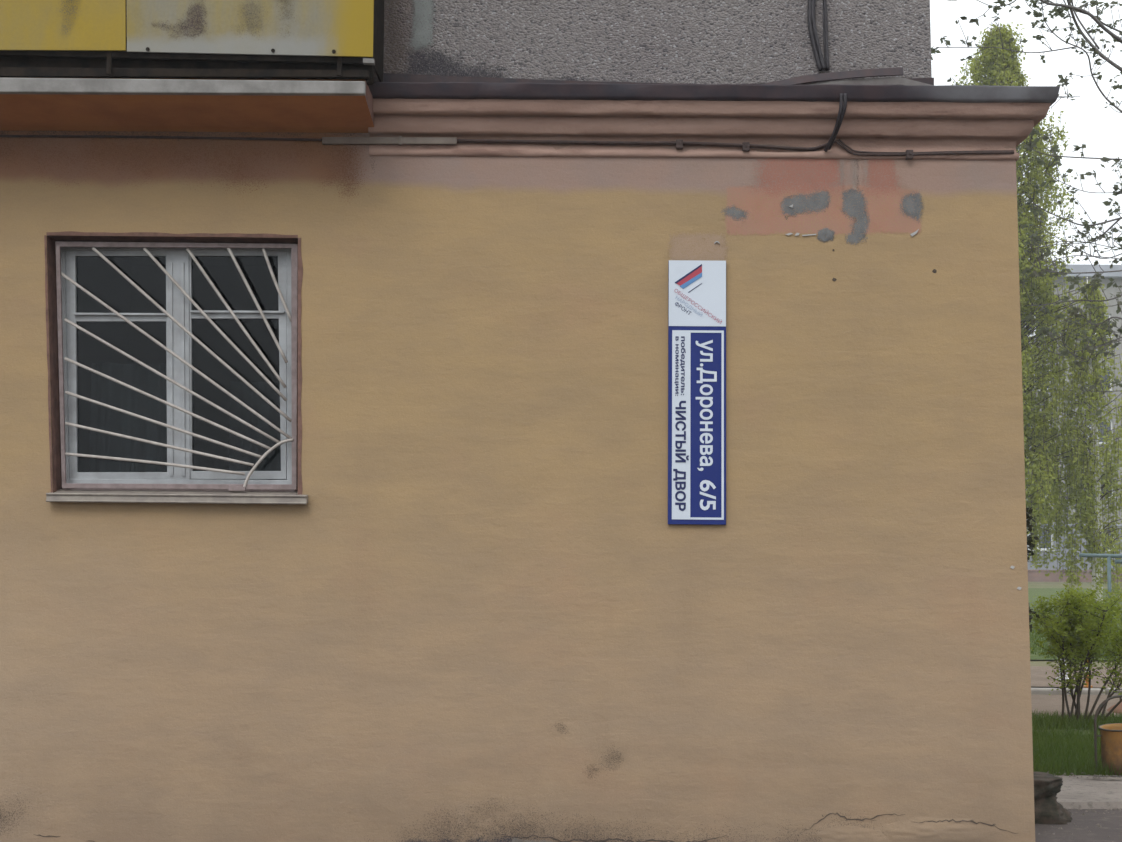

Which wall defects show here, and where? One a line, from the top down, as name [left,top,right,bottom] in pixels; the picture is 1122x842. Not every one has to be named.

flaking render [816,227,835,243]
crack [802,813,1017,834]